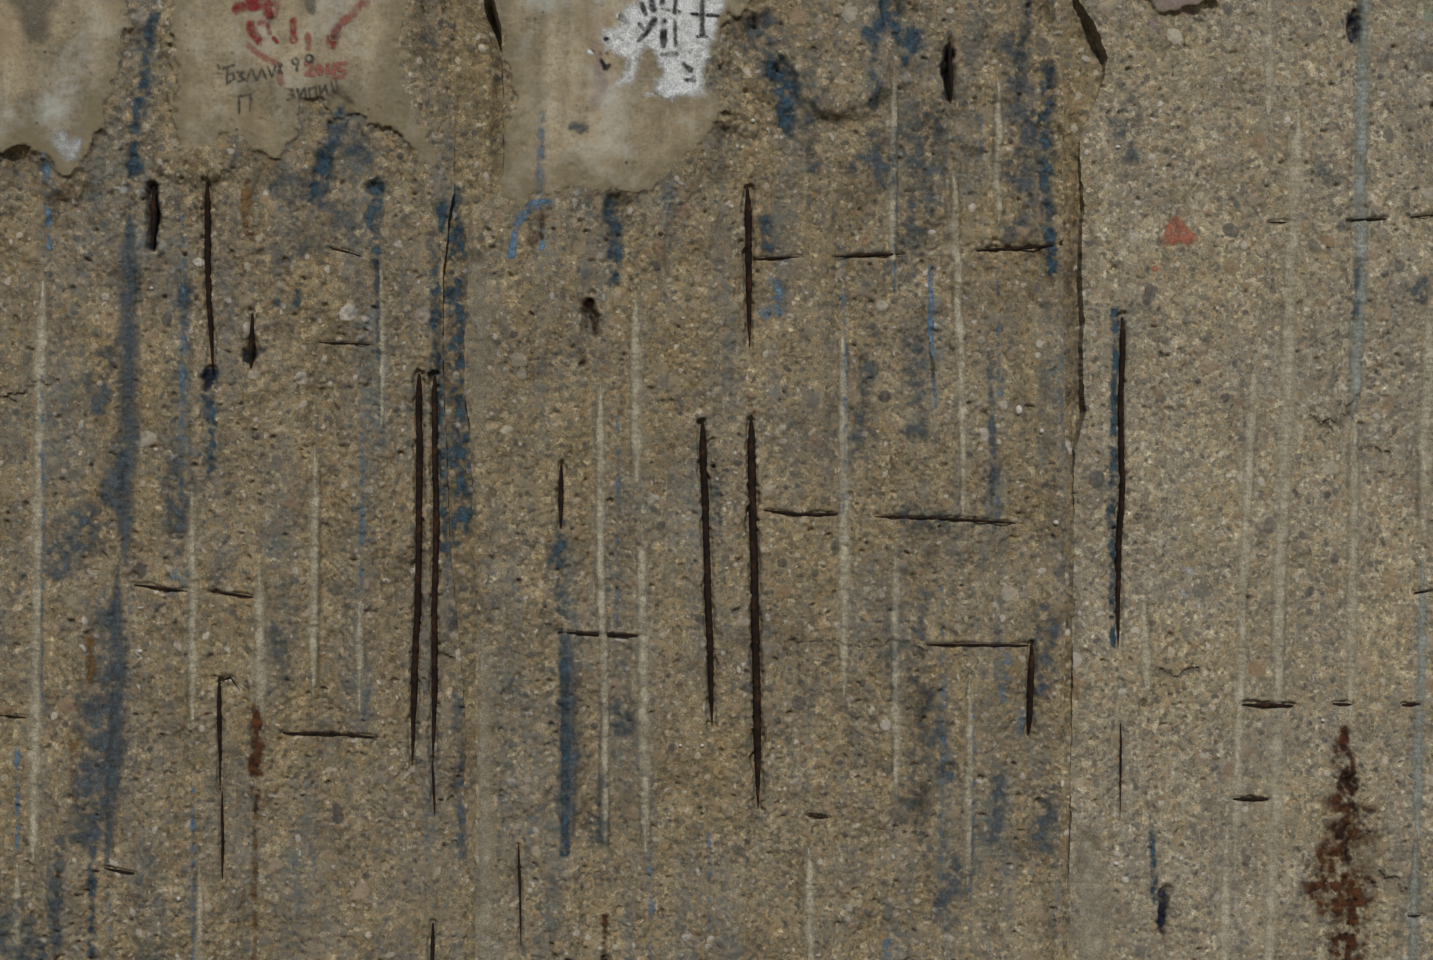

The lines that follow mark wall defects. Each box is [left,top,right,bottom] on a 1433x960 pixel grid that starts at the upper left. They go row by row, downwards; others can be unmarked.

spalling [0,0,468,960]
spalling [463,0,1433,960]
rust [1302,726,1374,960]